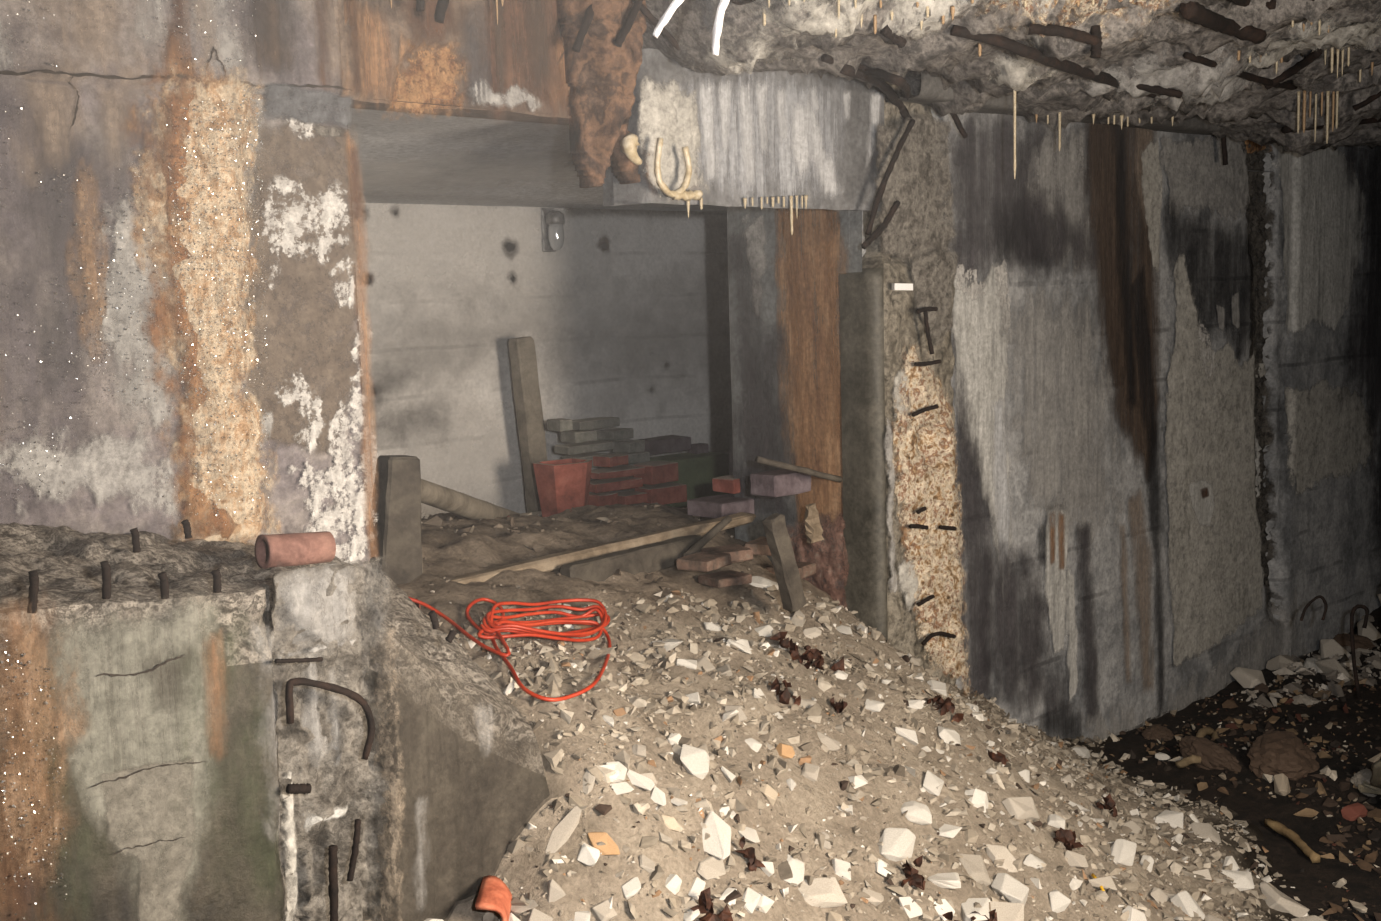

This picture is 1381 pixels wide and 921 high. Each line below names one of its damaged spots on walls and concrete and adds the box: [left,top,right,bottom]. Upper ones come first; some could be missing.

crack [0,47,352,128]
rust [484,0,702,198]
spalling [614,0,684,51]
spalling [711,0,756,56]
spalling [950,22,1183,98]
spalling [1179,0,1277,44]
spalling [1237,48,1323,90]
damp [244,92,396,452]
spalling [821,54,970,694]
damp [951,115,1306,742]
damp [1347,146,1381,544]
peeling [52,569,222,921]